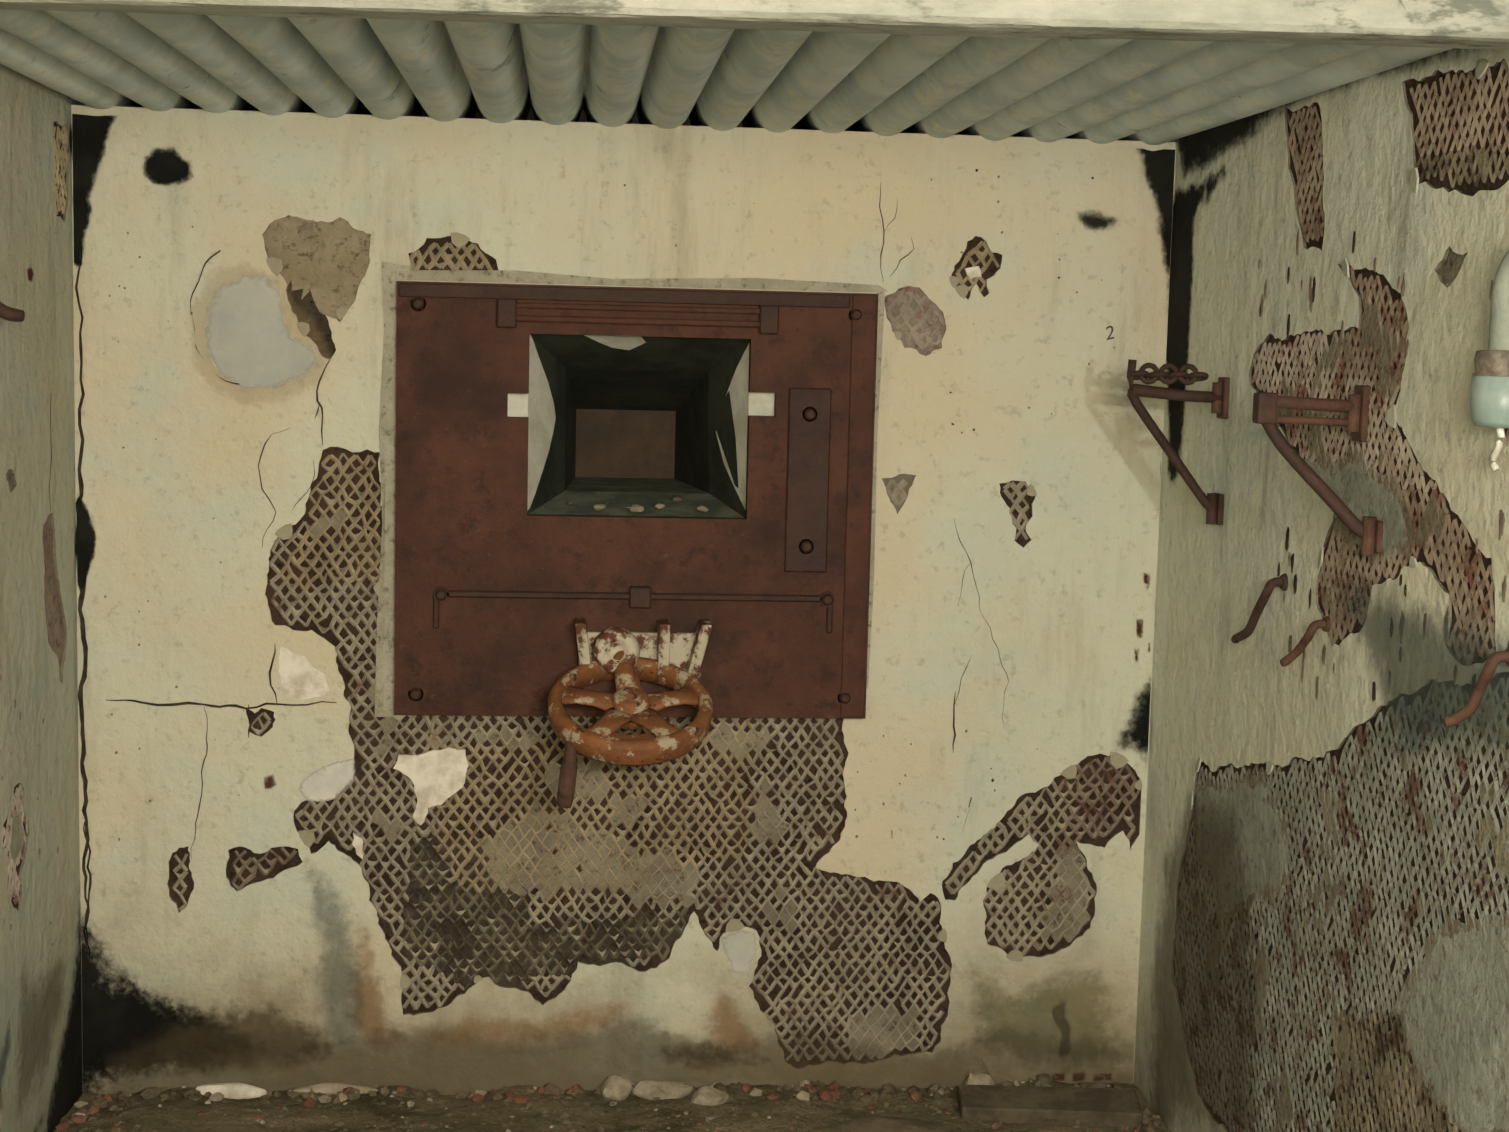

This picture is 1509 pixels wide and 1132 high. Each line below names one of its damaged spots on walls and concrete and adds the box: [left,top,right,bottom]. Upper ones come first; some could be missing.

spalling [1405,59,1509,196]
spalling [263,215,371,359]
spalling [949,231,1003,299]
spalling [1251,231,1509,700]
spalling [226,447,1142,1068]
spalling [1173,674,1509,1132]
leakage [35,921,320,1132]